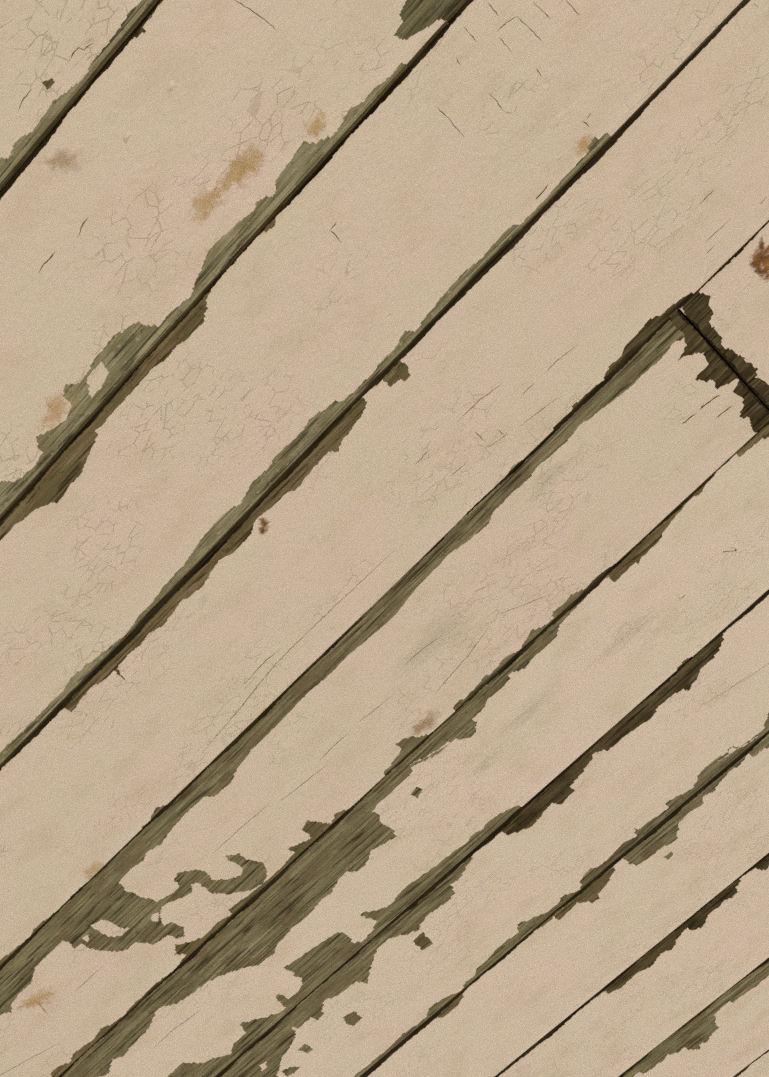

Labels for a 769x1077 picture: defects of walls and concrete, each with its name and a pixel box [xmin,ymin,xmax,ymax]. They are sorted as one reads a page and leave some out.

peeling [0,63,611,766]
peeling [0,292,769,1077]
peeling [394,0,468,40]
rust [751,238,769,280]